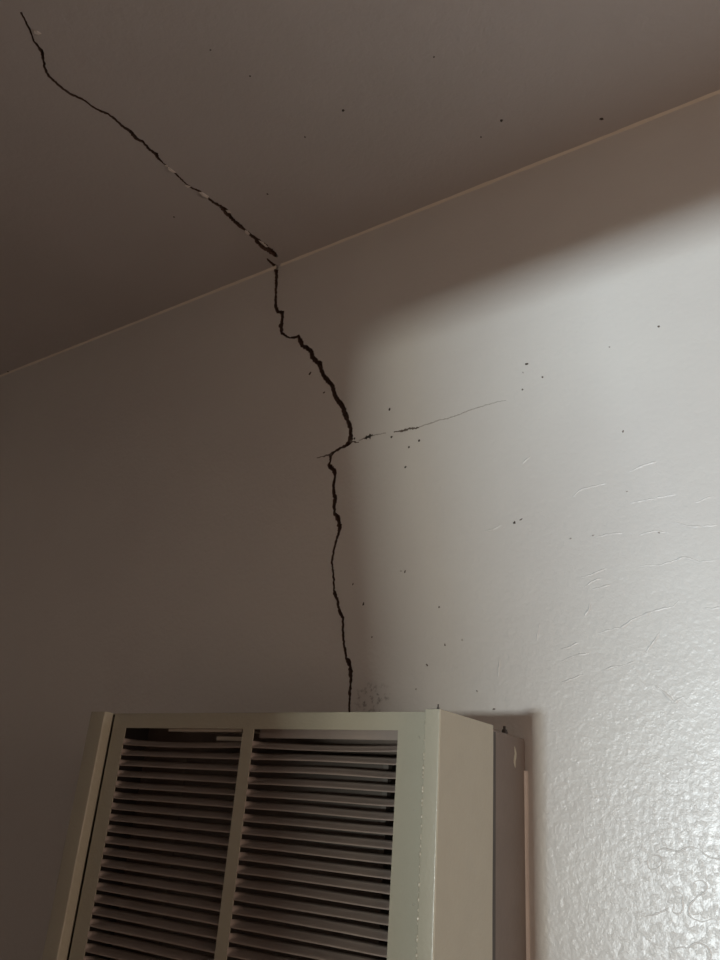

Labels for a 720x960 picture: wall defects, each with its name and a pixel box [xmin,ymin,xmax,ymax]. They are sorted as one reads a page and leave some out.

crack [20,12,506,712]